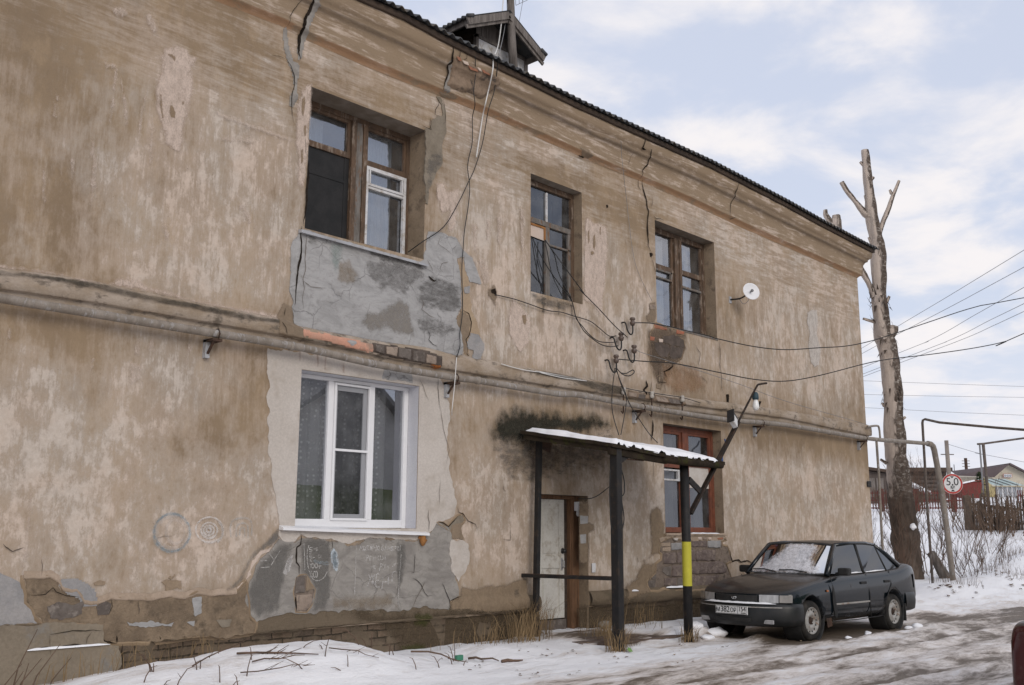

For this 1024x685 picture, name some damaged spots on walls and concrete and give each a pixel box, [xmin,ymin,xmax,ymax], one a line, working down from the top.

peeling [144,47,195,151]
crack [424,47,467,130]
crack [273,0,321,304]
crack [629,139,661,268]
spalling [303,329,442,367]
peeling [364,302,413,334]
peeling [456,261,484,360]
spalling [627,302,687,407]
leakage [499,417,591,477]
spalling [20,533,278,646]
spalling [437,510,531,612]
spalling [627,507,732,599]